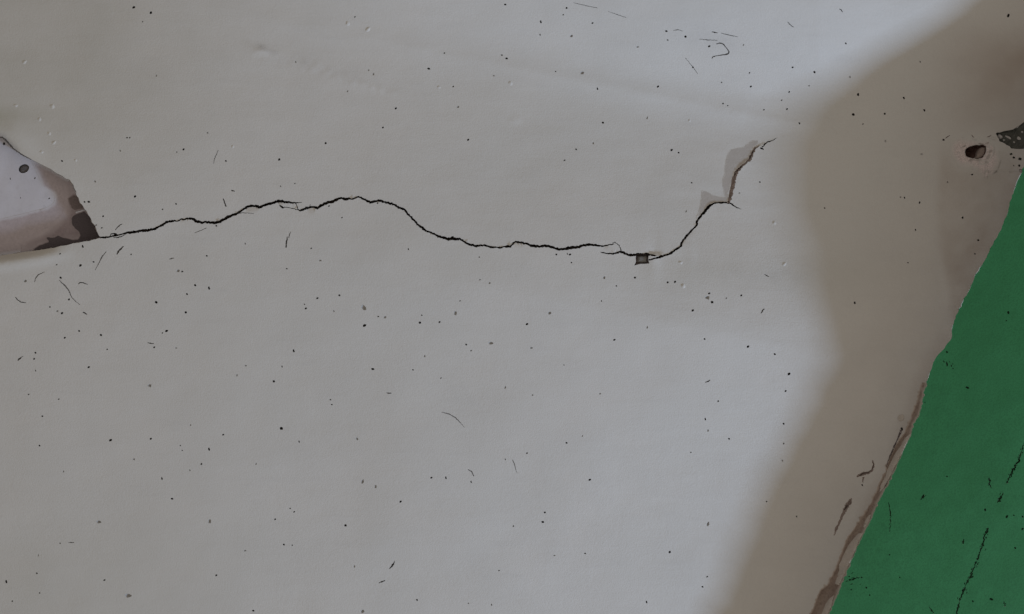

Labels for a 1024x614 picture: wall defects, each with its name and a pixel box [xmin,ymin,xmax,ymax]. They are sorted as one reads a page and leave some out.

flaking render [0,137,104,265]
crack [101,138,776,260]
spalling [942,122,1024,179]